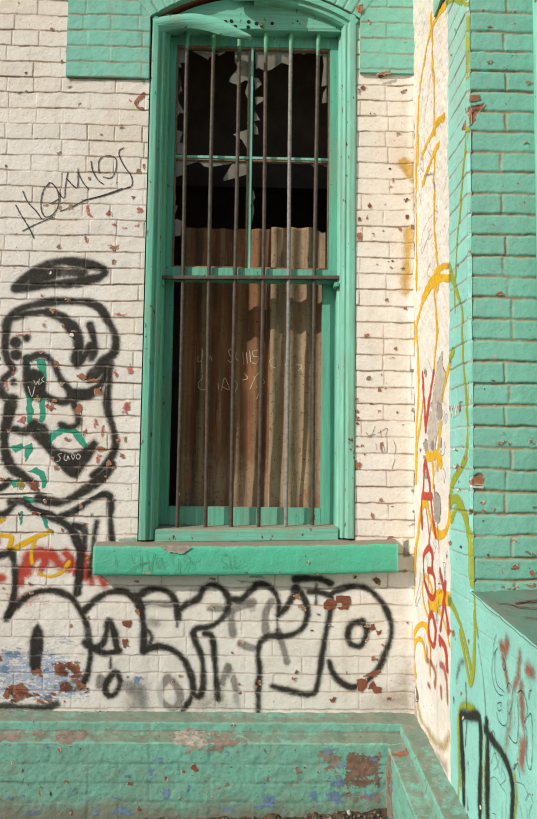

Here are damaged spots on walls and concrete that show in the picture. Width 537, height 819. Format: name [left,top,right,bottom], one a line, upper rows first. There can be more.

spalling [462,94,485,131]
spalling [419,352,462,460]
spalling [452,445,484,491]
spalling [432,492,441,524]
spalling [317,595,351,616]
spalling [356,656,394,701]
peeling [172,723,247,774]
spalling [309,743,408,819]